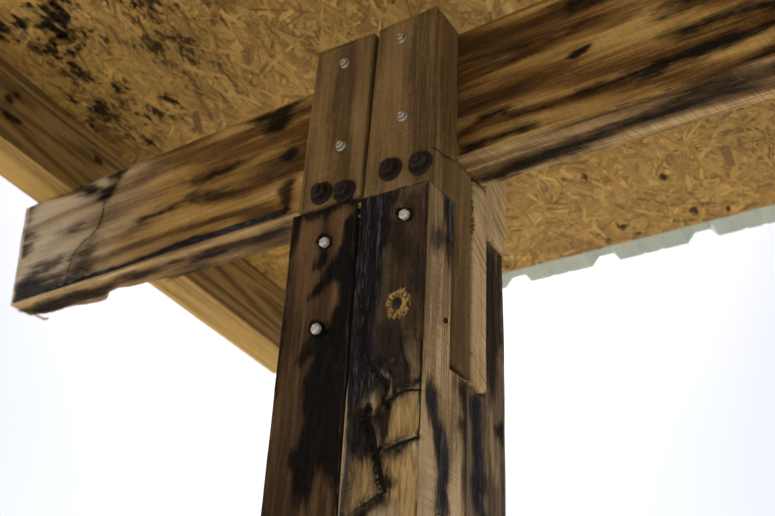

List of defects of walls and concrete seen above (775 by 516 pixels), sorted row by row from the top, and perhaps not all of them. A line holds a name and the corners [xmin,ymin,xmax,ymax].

damp [0,0,186,150]
damp [102,0,212,96]
crack [65,178,120,284]
crack [347,285,421,516]